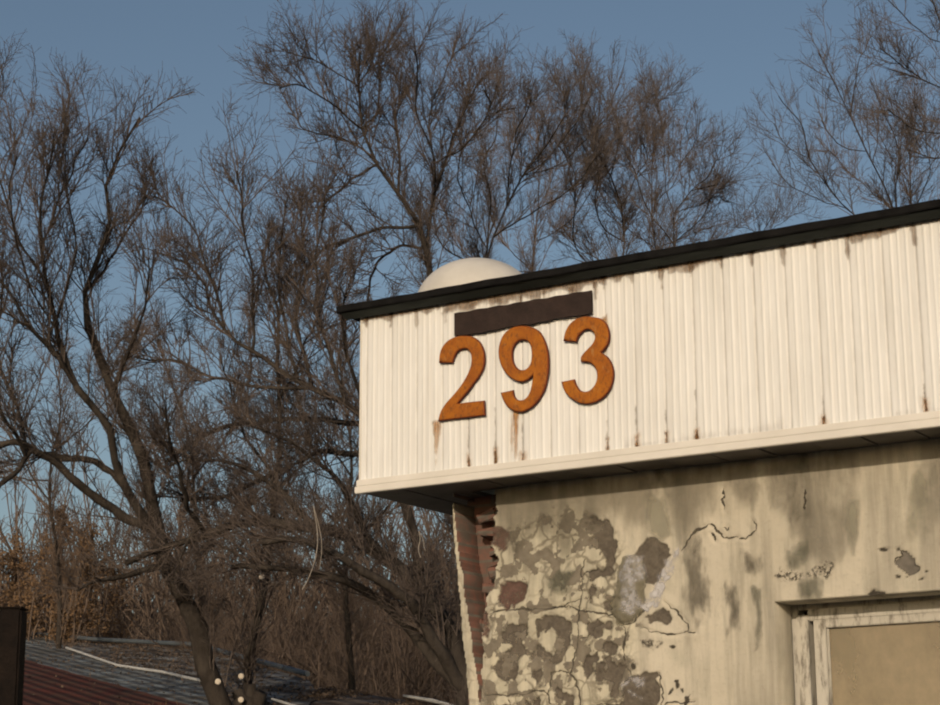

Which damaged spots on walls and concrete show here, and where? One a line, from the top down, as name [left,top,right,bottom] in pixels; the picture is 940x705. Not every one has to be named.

crack [681,488,757,551]
flaking render [476,507,690,705]
damp [621,548,706,614]
flaking render [777,562,833,581]
flaking render [880,548,928,580]